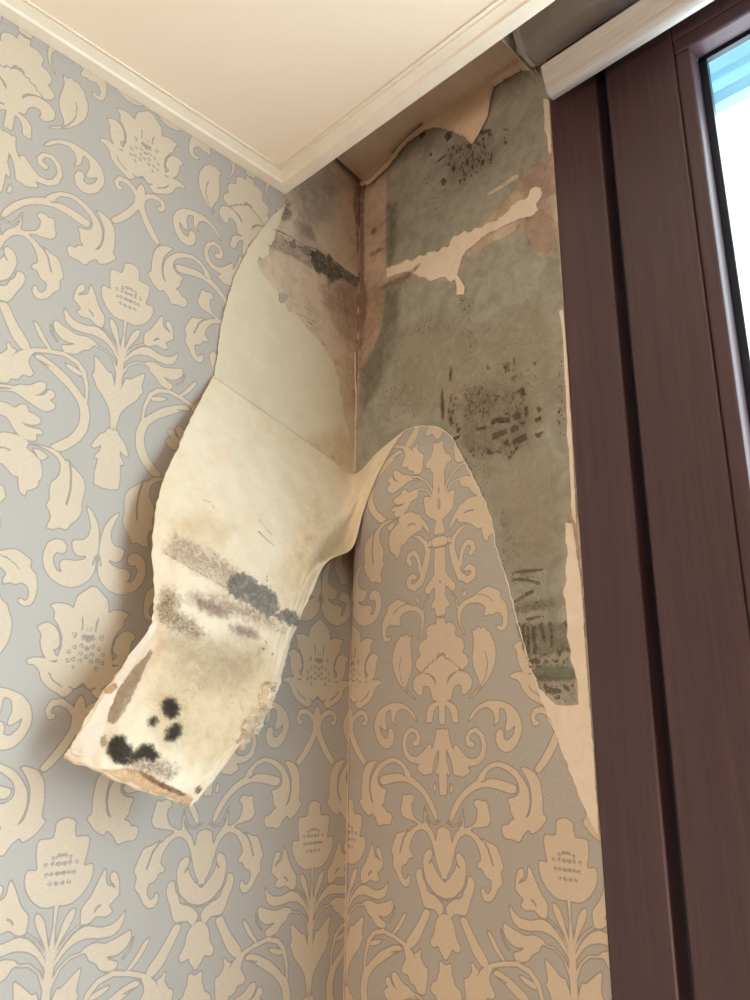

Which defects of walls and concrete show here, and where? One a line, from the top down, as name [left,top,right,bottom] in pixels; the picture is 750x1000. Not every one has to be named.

damp [429,128,508,183]
damp [280,186,376,347]
flaking render [258,65,591,710]
damp [441,333,565,496]
damp [159,591,204,636]
damp [173,537,299,626]
damp [500,508,576,702]
damp [107,735,158,765]
damp [150,698,182,742]